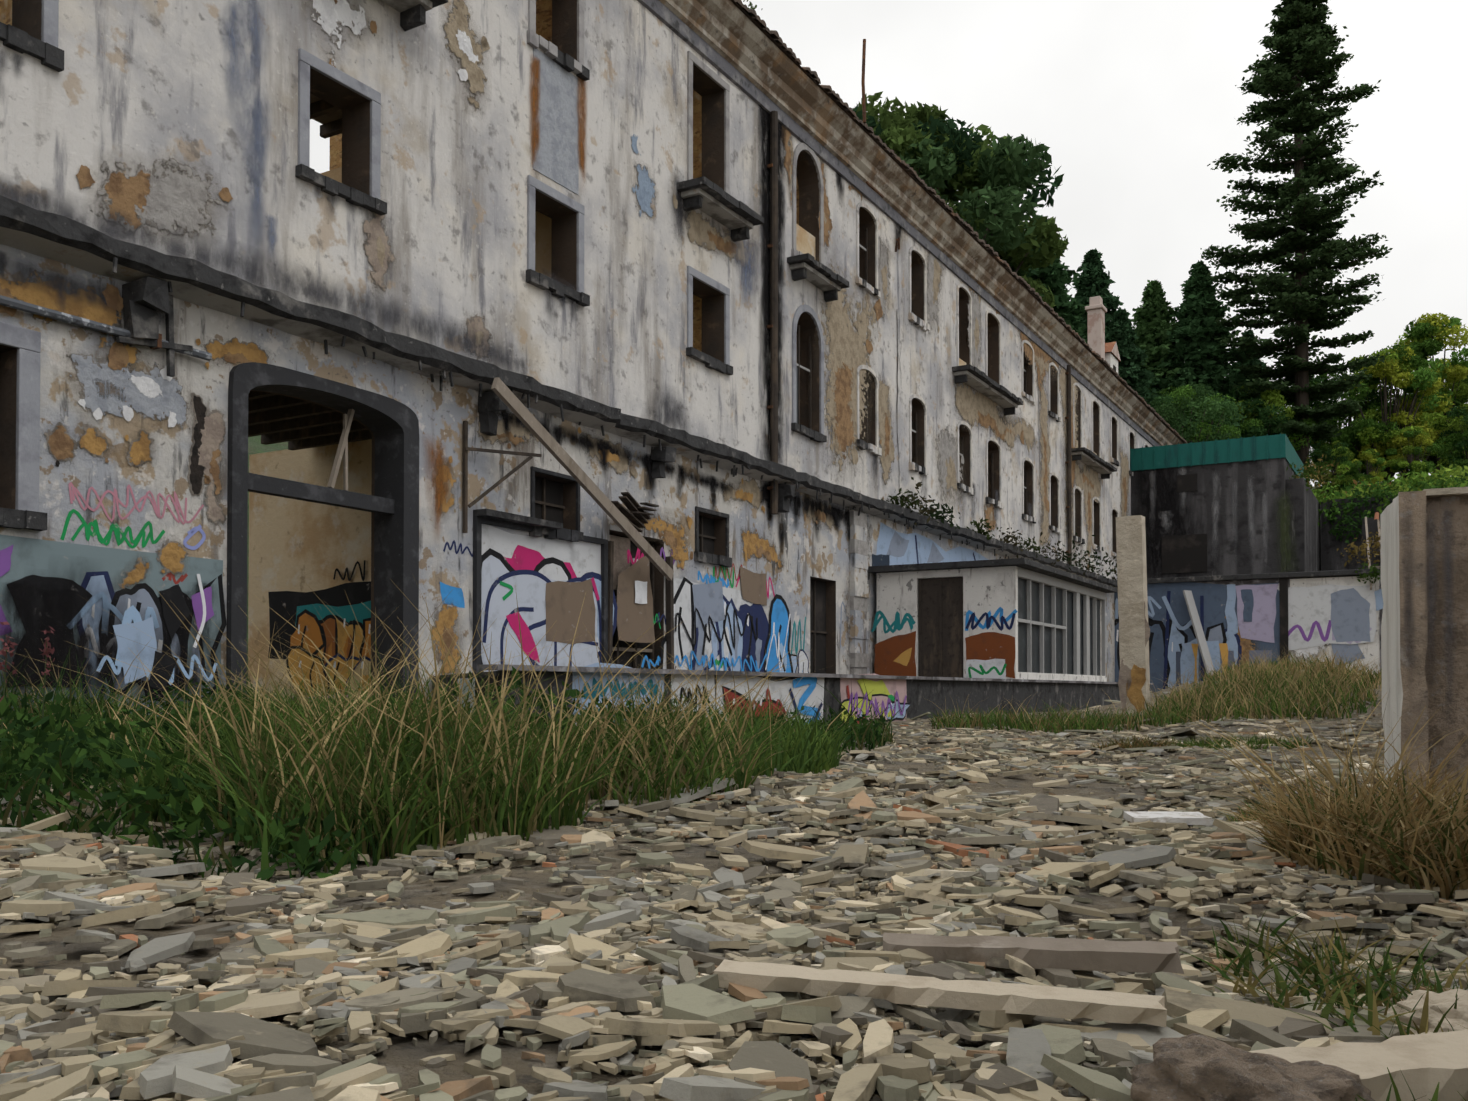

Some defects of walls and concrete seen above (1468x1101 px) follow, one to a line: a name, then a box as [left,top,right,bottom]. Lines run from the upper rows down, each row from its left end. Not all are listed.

leakage [227,8,261,89]
peeling [305,0,377,68]
peeling [444,0,490,111]
spalling [76,158,233,239]
leakage [252,107,275,248]
spalling [631,134,755,270]
leakage [0,182,519,369]
peeling [0,270,227,524]